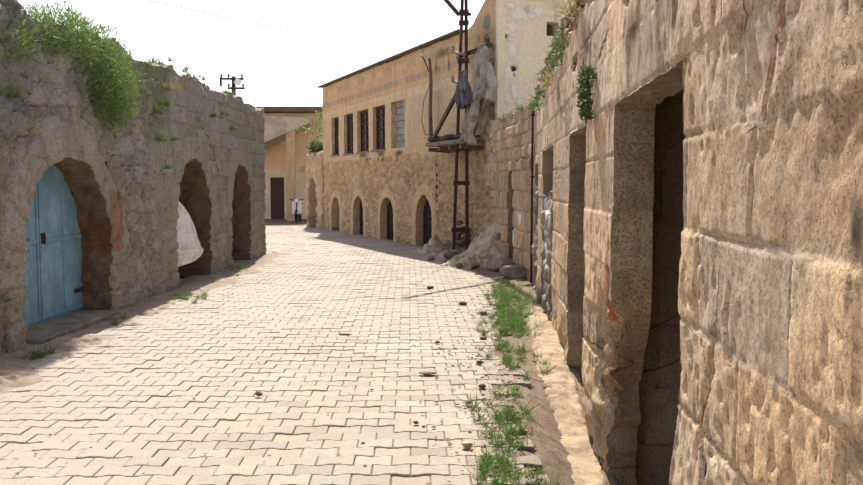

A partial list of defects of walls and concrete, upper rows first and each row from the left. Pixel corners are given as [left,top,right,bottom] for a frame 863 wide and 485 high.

crack [745,0,786,134]
crack [701,267,720,432]
crack [691,457,707,485]